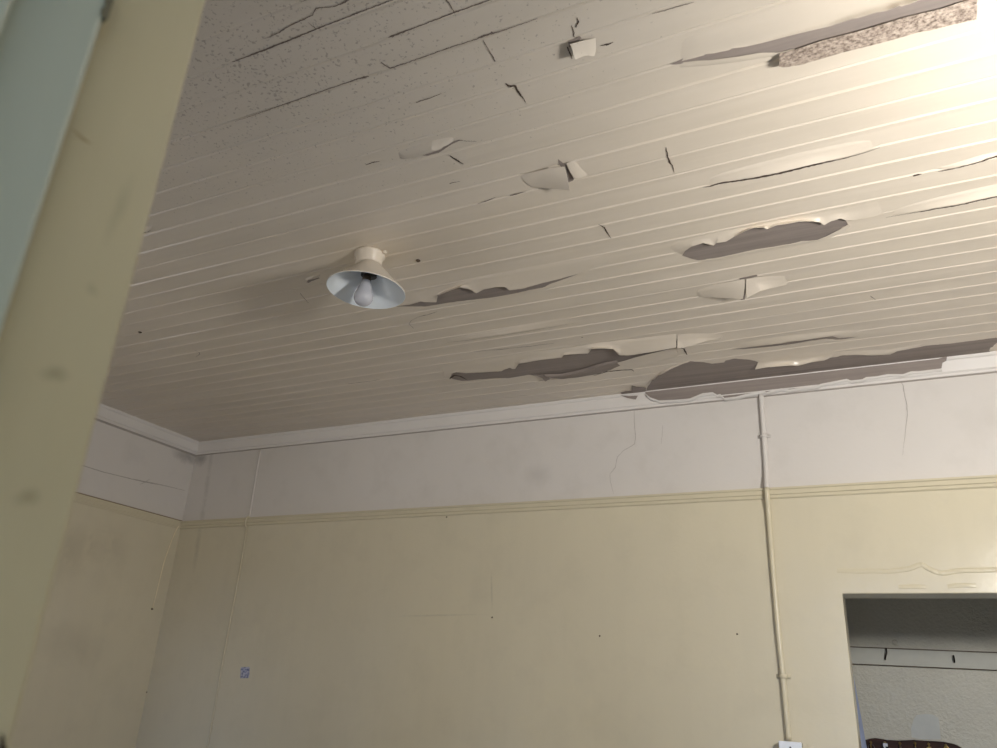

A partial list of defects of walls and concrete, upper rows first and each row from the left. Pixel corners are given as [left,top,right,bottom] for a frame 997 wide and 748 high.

crack [233,0,392,62]
crack [388,0,490,38]
peeling [567,18,613,60]
peeling [671,0,977,67]
crack [235,19,535,122]
peeling [521,159,588,191]
peeling [670,194,893,262]
peeling [397,249,620,310]
peeling [442,330,997,404]